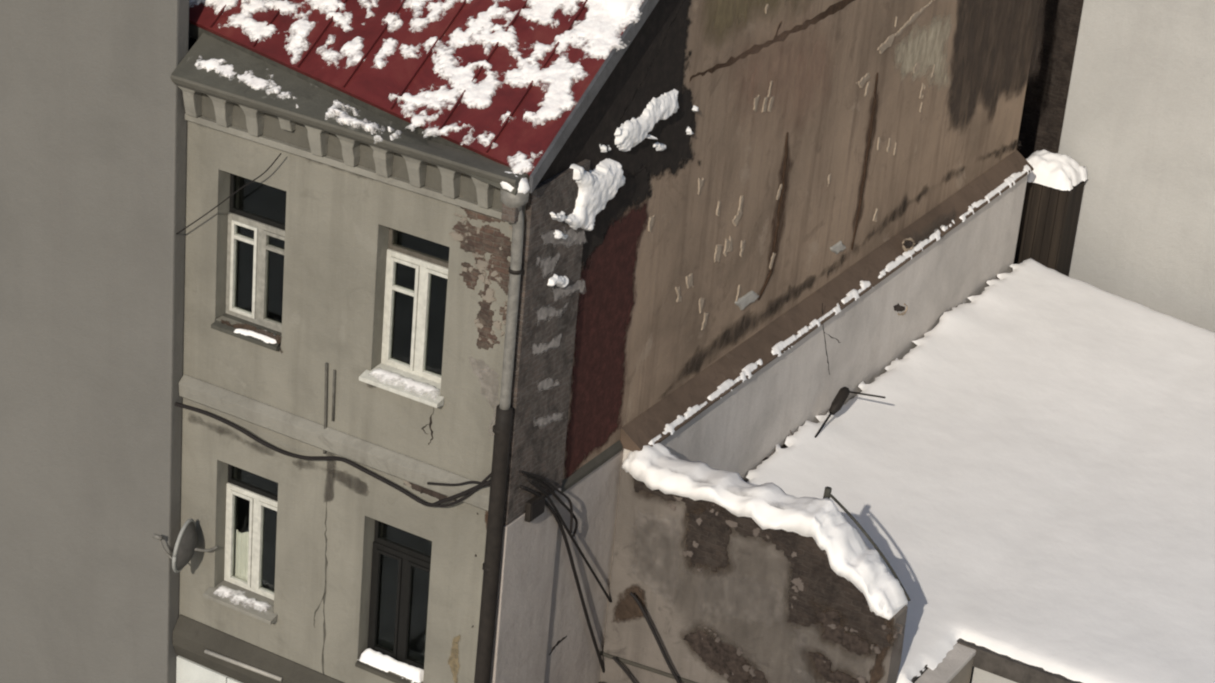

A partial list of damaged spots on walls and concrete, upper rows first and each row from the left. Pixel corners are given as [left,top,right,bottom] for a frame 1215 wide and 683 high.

crack [690,0,855,81]
damp [948,0,1044,127]
spalling [449,196,512,350]
crack [313,501,328,674]
spalling [633,478,903,683]